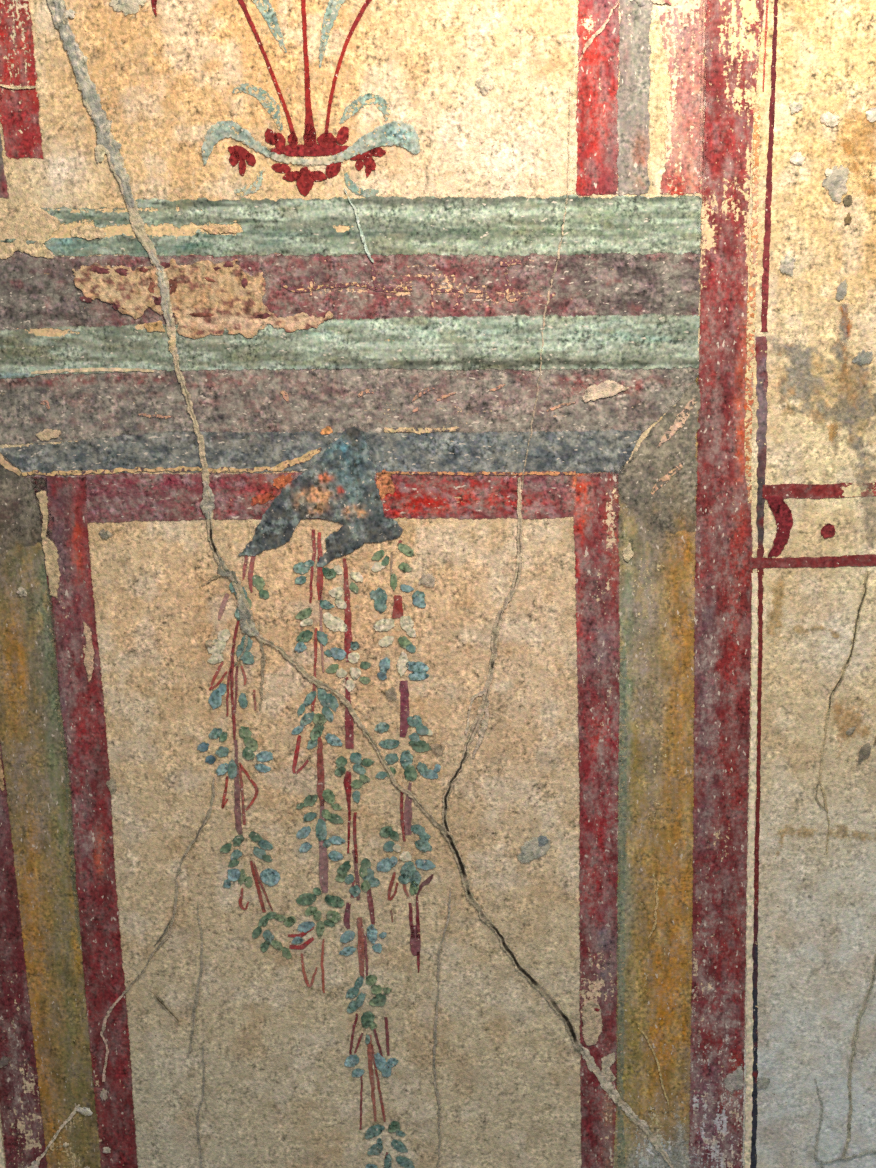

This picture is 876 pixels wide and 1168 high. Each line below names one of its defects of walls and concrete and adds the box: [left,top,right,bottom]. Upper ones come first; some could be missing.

peeling [72,258,333,339]
crack [27,0,675,1168]
crack [815,571,870,858]
crack [815,954,876,1168]